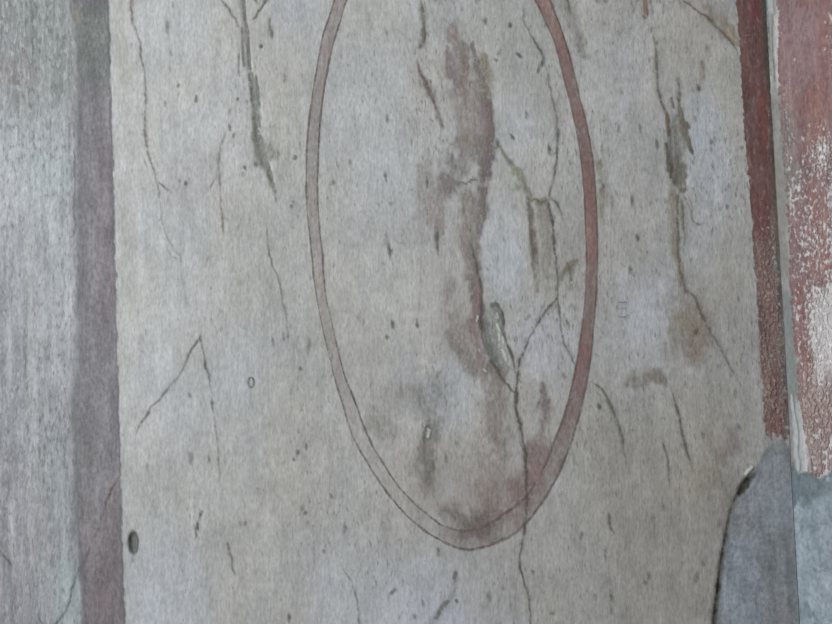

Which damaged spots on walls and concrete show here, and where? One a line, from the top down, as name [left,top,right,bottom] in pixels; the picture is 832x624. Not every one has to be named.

leakage [492,145,529,192]
leakage [527,197,548,270]
crack [676,194,705,321]
peeling [803,127,832,270]
crack [473,87,572,624]
peeling [800,290,832,474]